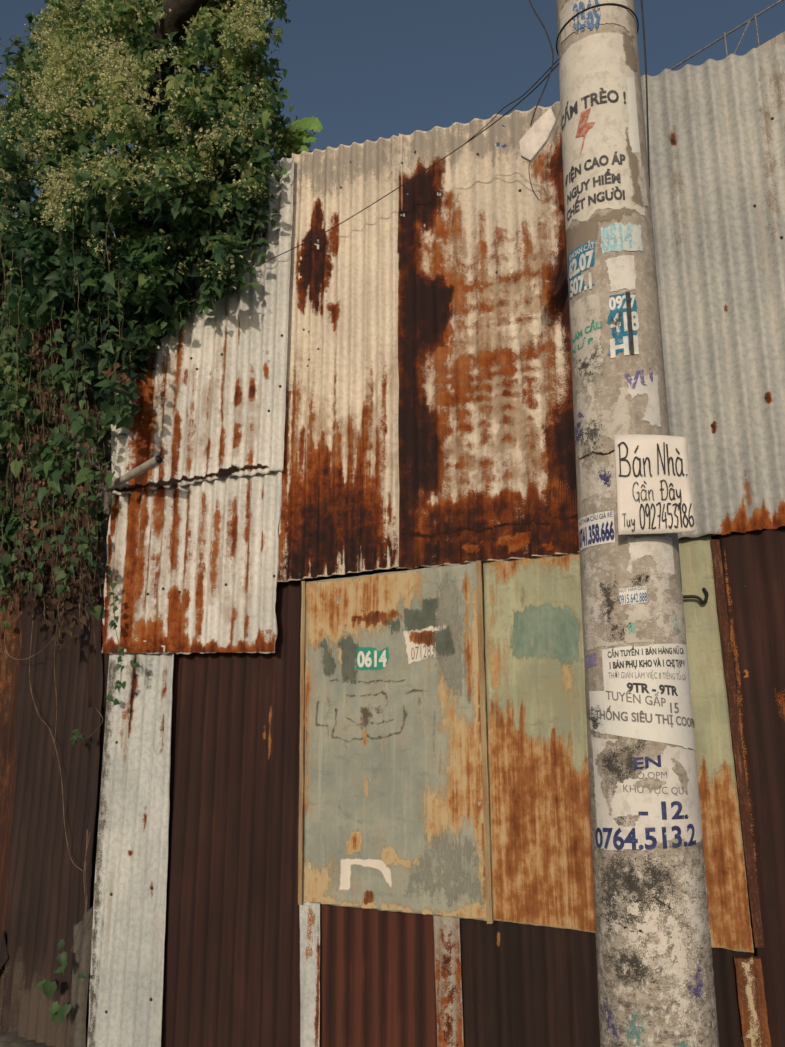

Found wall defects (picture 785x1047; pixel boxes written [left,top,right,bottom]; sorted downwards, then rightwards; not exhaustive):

corrosion [102,305,277,759]
peeling [306,571,429,664]
corrosion [278,133,595,1047]
corrosion [698,552,760,952]
corrosion [714,470,785,535]